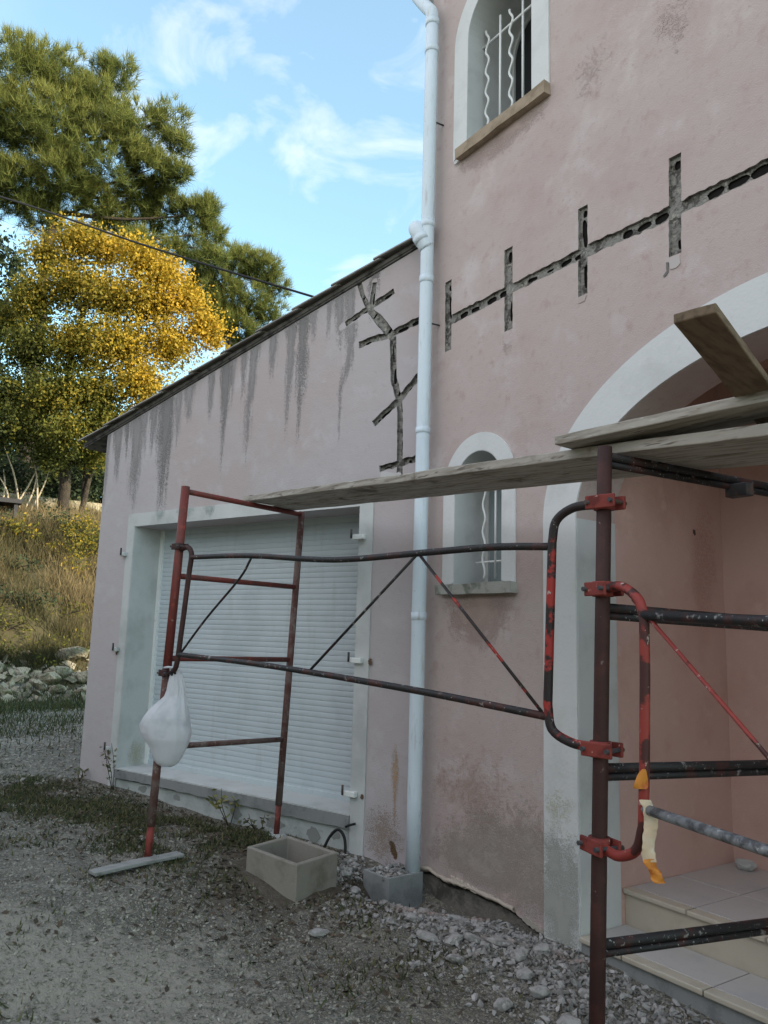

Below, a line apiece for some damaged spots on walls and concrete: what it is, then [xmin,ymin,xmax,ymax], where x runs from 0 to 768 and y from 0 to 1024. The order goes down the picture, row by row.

peeling [663,255,681,277]
leakage [101,272,381,534]